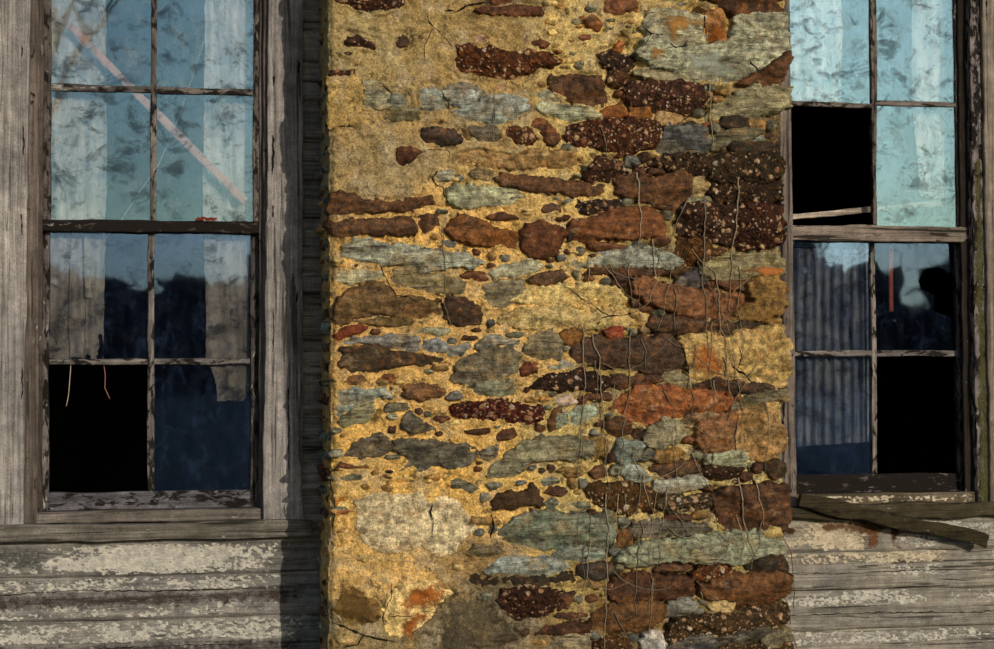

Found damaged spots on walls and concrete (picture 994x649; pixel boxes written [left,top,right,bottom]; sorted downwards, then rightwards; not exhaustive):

crack [424,2,485,57]
peeling [782,521,949,576]
peeling [931,520,994,535]
peeling [0,543,301,649]
peeling [784,589,927,607]
peeling [792,626,994,646]